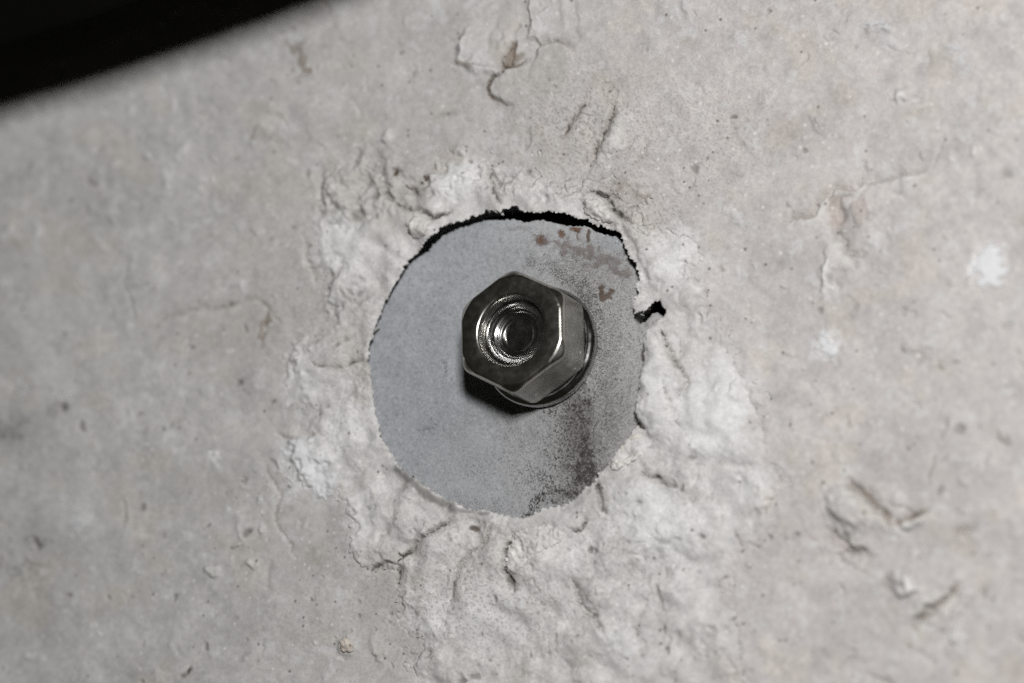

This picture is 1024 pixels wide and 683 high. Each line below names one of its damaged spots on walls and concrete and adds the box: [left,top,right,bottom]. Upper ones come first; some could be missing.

corrosion [535,227,631,277]
corrosion [598,285,614,301]
spalling [280,112,794,683]